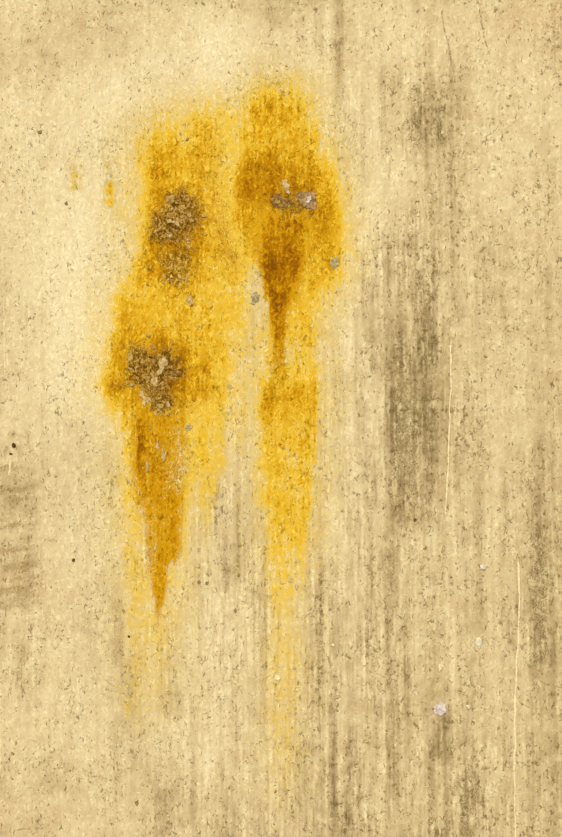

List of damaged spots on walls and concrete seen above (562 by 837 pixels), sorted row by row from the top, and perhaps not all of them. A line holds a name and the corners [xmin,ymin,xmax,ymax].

water stain [360,68,466,170]
corrosion [64,43,379,829]
water stain [362,170,472,550]